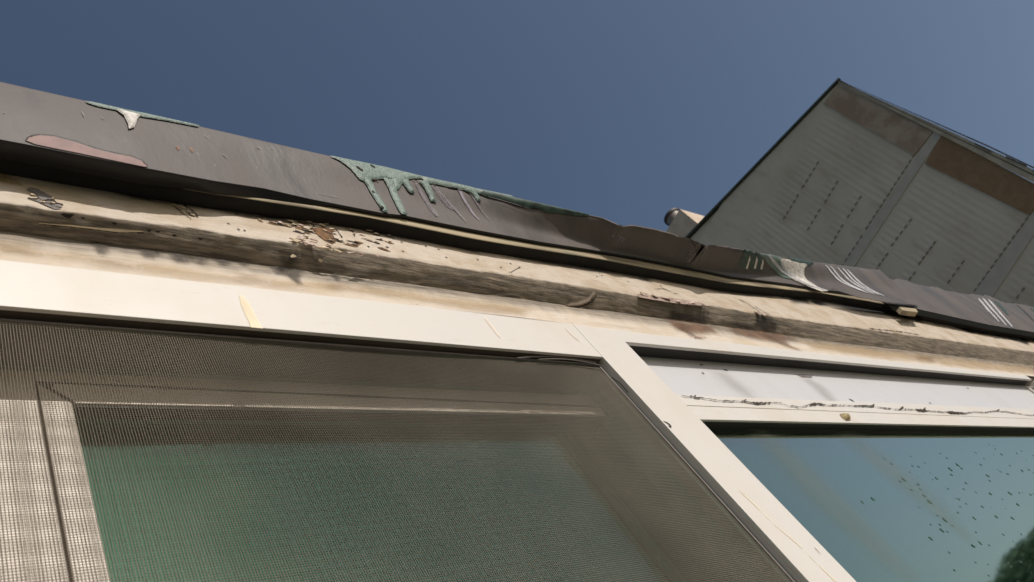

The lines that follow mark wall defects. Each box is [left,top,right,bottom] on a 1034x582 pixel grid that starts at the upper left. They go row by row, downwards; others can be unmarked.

peeling [27,187,176,237]
damp [121,193,284,221]
peeling [258,216,404,262]
damp [272,260,299,282]
damp [521,257,649,280]
damp [676,282,922,322]
damp [954,326,1034,344]